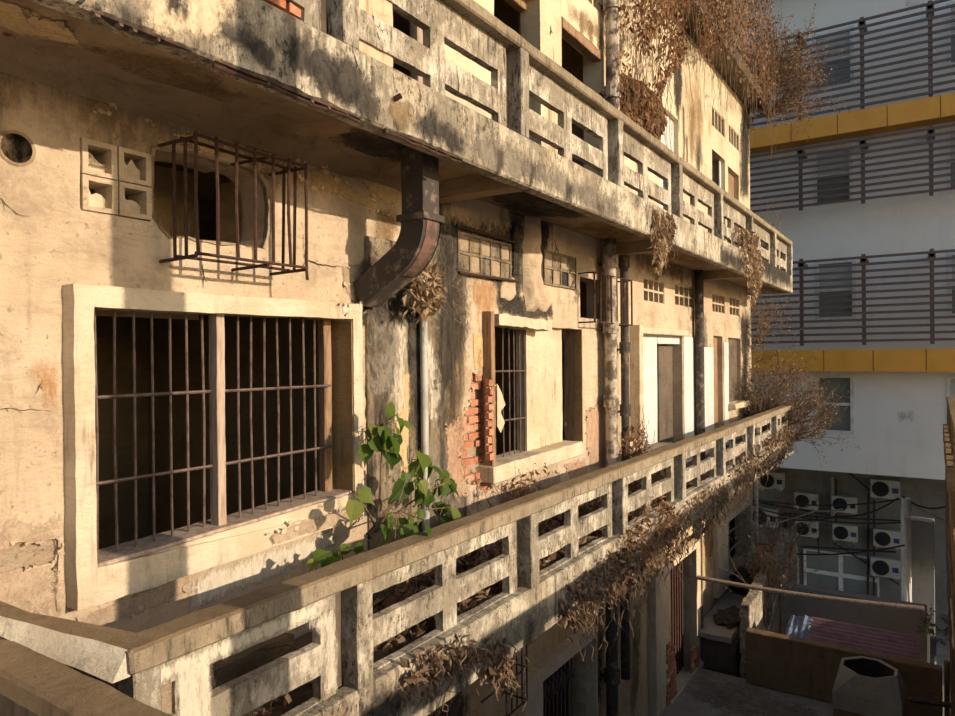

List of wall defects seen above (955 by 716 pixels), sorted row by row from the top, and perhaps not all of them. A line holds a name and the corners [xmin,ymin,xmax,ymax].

peeling [0,2,82,49]
damp [673,59,703,171]
damp [739,103,750,201]
damp [91,0,637,527]
corrosion [402,219,438,277]
spalling [445,375,604,502]
peeling [0,516,66,616]
mould [363,604,552,716]
spalling [666,641,677,707]